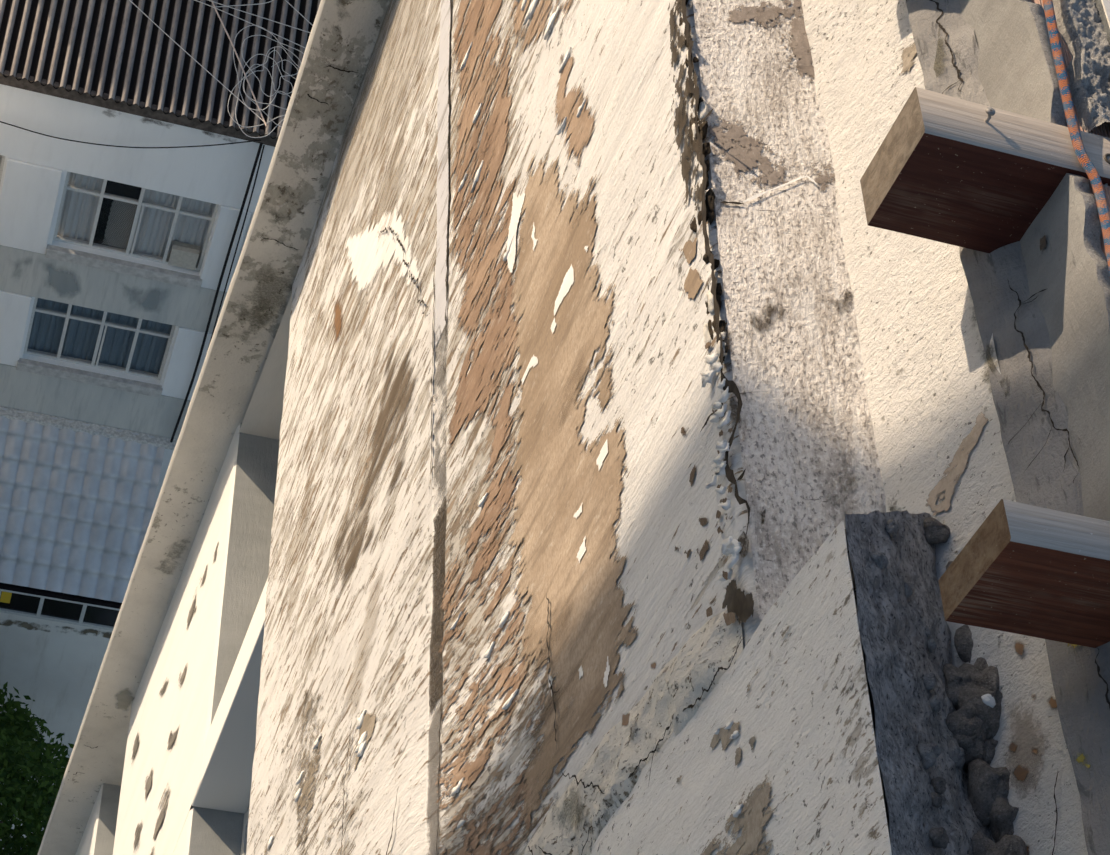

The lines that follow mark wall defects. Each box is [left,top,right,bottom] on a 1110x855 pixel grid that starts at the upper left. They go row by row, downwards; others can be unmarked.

peeling [728,0,815,82]
crack [905,0,963,94]
spalling [1018,0,1066,127]
crack [377,0,452,482]
peeling [435,0,638,855]
spalling [667,0,789,626]
crack [1004,280,1079,483]
spalling [1068,173,1110,332]
crack [533,595,608,855]
crack [628,637,745,786]
crack [1095,649,1110,709]
peeling [133,769,170,855]